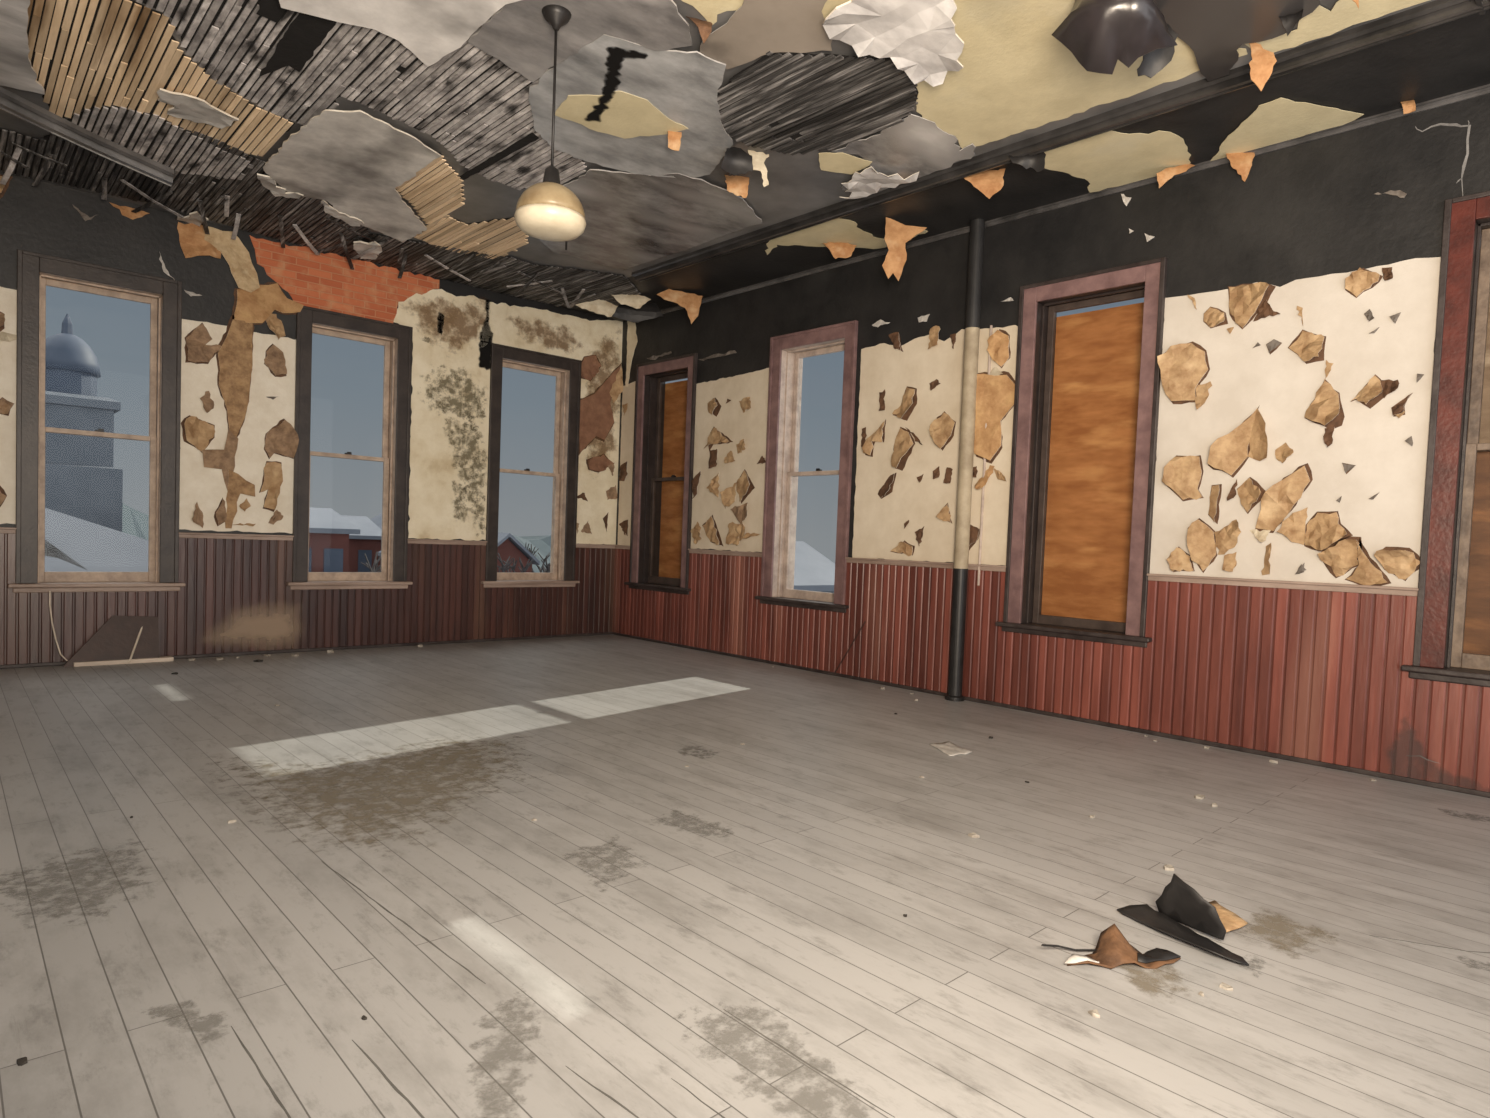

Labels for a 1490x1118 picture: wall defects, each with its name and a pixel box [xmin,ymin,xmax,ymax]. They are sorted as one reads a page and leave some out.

flaking render [256,0,337,77]
flaking render [682,0,744,43]
flaking render [555,91,688,151]
peeling [721,147,769,198]
flaking render [819,152,872,174]
flaking render [916,0,1429,199]
flaking render [765,217,928,281]
flaking render [177,222,703,545]
water stain [426,370,487,535]
peeling [861,379,955,498]
peeling [1162,408,1420,585]
peeling [1188,282,1424,447]